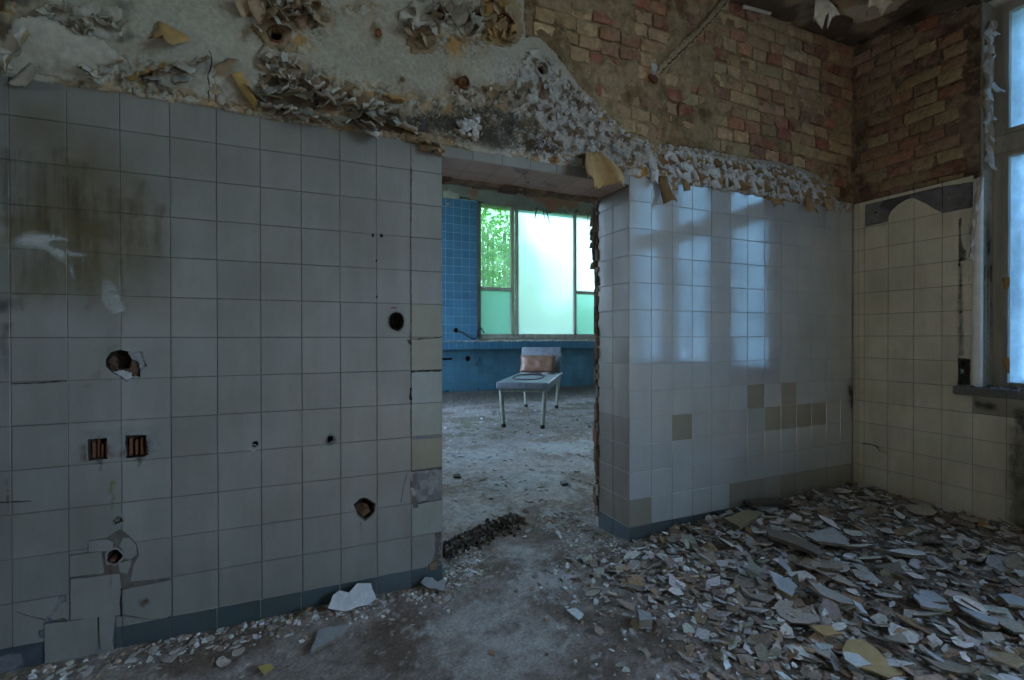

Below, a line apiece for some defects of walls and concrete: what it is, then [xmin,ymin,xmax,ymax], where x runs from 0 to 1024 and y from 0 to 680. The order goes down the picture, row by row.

peeling [0,0,447,157]
flaking render [398,0,1005,517]
spalling [106,350,147,381]
spalling [353,497,376,521]
spalling [44,537,172,664]